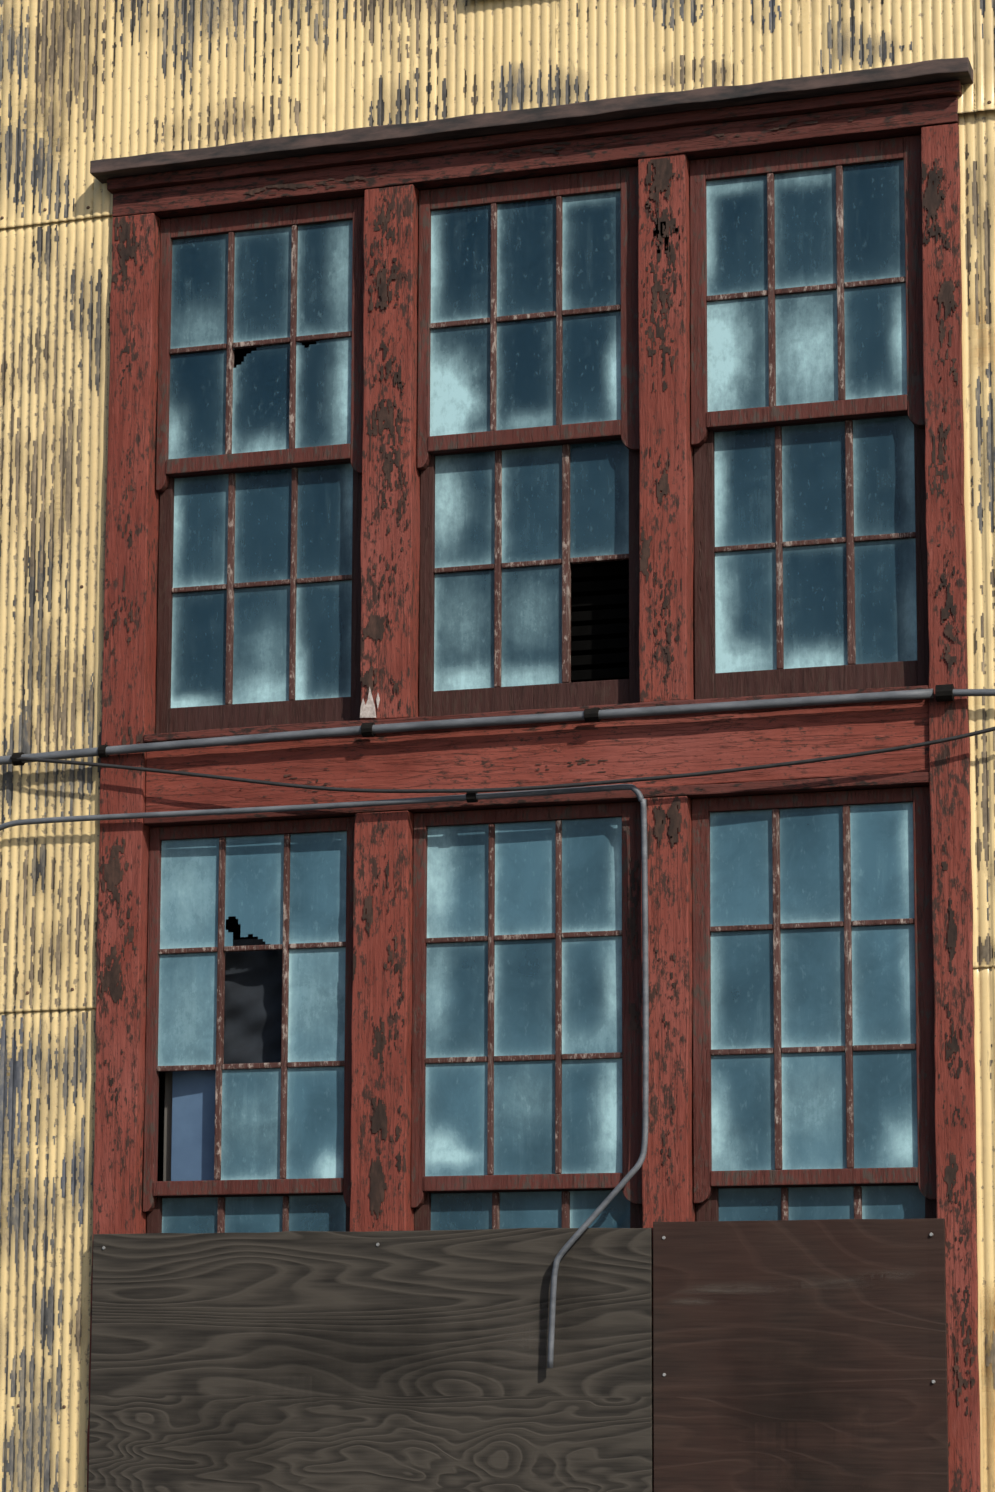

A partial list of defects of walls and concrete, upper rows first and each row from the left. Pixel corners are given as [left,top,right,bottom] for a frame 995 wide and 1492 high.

peeling [980,0,995,69]
peeling [639,157,684,392]
peeling [922,136,991,385]
peeling [0,0,590,832]
peeling [640,526,682,694]
peeling [653,797,682,848]
peeling [935,544,995,973]
peeling [353,854,405,1071]
peeling [0,836,137,1492]
peeling [368,1096,403,1227]
peeling [937,1153,967,1212]
peeling [948,1285,995,1415]